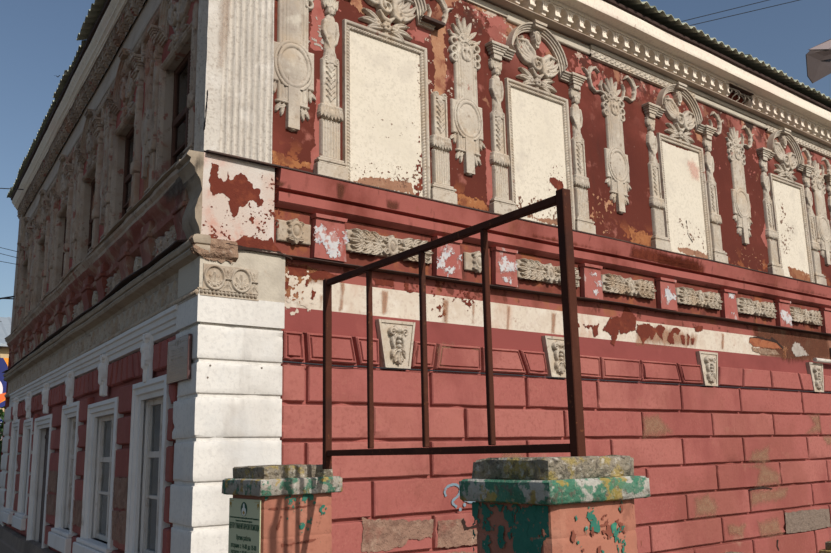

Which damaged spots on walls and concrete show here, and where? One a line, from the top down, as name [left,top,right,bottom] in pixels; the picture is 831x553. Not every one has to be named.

peeling [544,166,565,191]
peeling [202,163,282,253]
peeling [314,223,349,259]
peeling [285,263,338,315]
peeling [372,277,418,293]
peeling [578,306,703,346]
spalling [749,338,782,355]
spalling [792,342,809,357]
peeling [282,494,327,535]
peeling [361,502,550,553]
crack [461,518,476,531]
peeling [571,500,626,553]